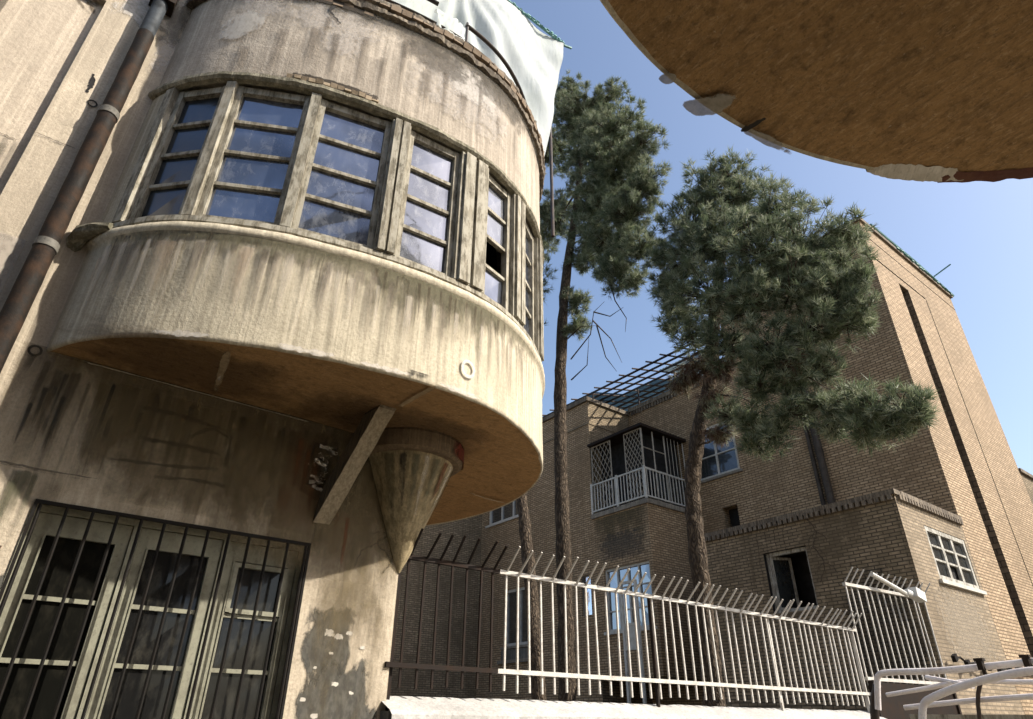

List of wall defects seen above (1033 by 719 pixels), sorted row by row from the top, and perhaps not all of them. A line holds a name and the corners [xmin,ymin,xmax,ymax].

flaking render [659,72,676,84]
flaking render [683,94,736,116]
flaking render [741,118,790,153]
damp [109,230,533,354]
damp [0,471,37,518]
damp [16,353,453,635]
spalling [296,608,377,719]